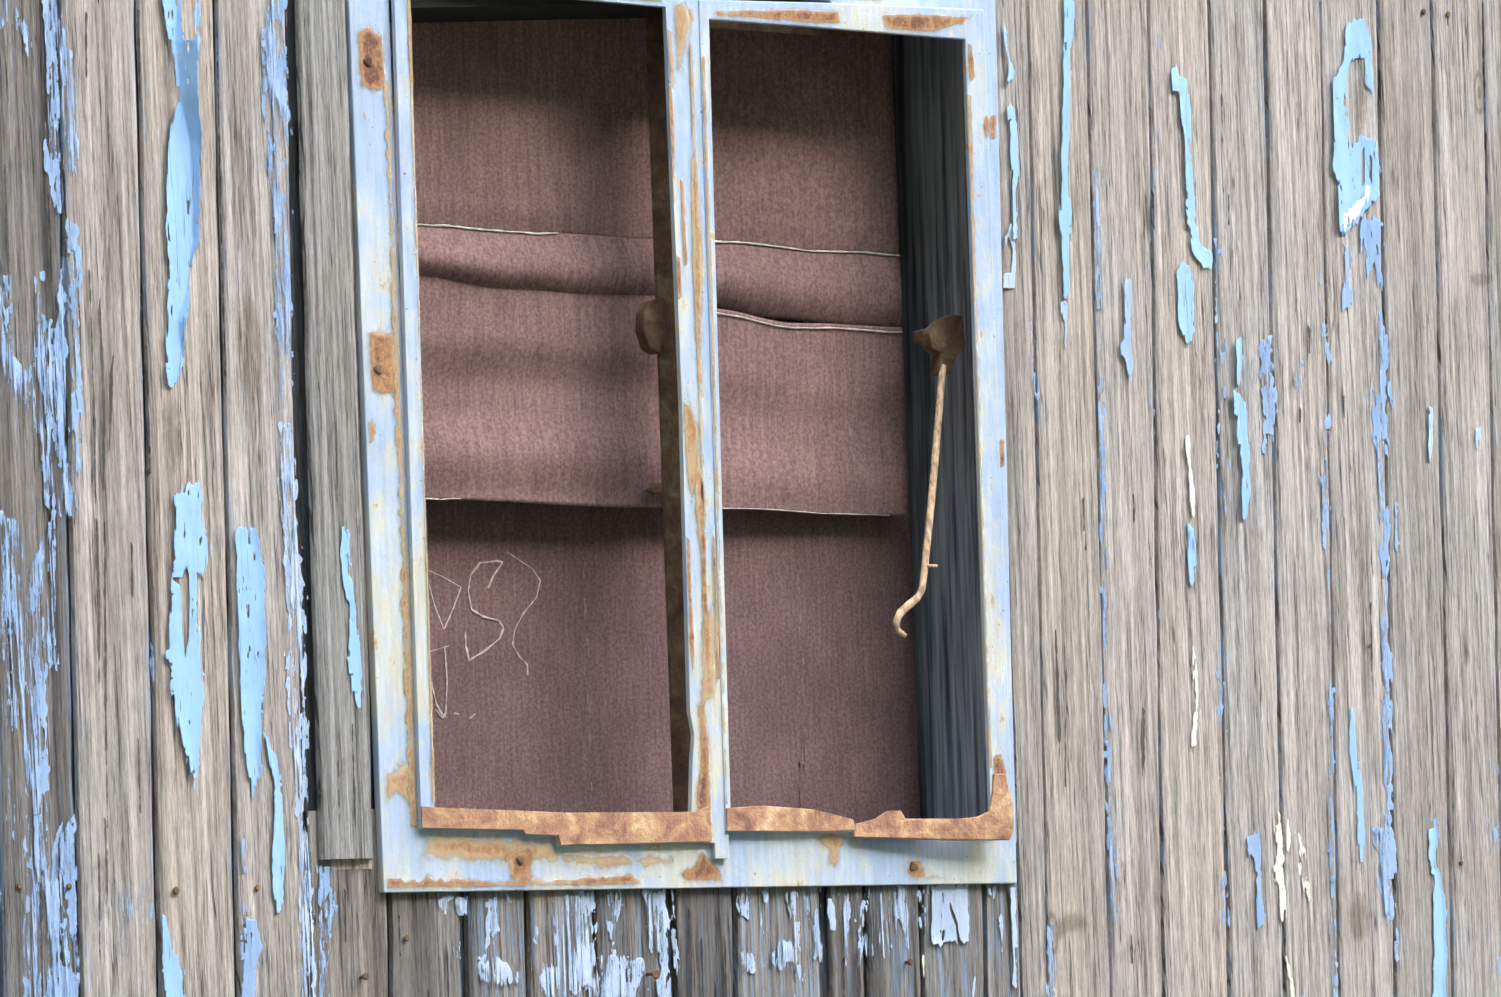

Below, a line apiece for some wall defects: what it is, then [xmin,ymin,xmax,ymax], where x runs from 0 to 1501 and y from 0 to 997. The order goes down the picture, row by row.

corrosion [715,10,840,23]
corrosion [883,14,966,31]
peeling [162,0,203,388]
peeling [0,0,84,997]
peeling [148,481,213,789]
peeling [235,0,338,997]
corrosion [358,0,727,887]
peeling [1320,18,1400,997]
peeling [438,889,680,997]
corrosion [820,835,845,865]
peeling [736,884,969,997]
corrosion [908,861,924,877]